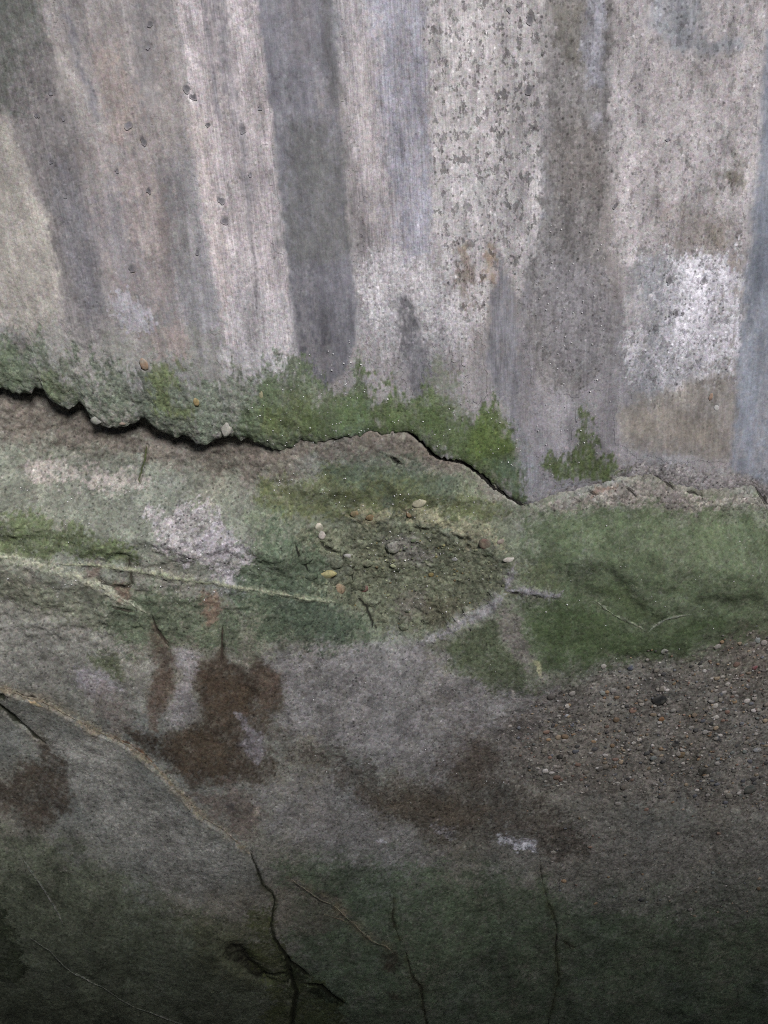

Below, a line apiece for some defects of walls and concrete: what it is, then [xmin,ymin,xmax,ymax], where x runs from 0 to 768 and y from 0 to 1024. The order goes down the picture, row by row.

damp [0,0,166,359]
damp [115,0,768,497]
crack [138,446,147,485]
crack [410,433,524,505]
damp [340,499,512,554]
damp [164,642,203,728]
damp [231,710,267,769]
crack [250,852,344,1024]